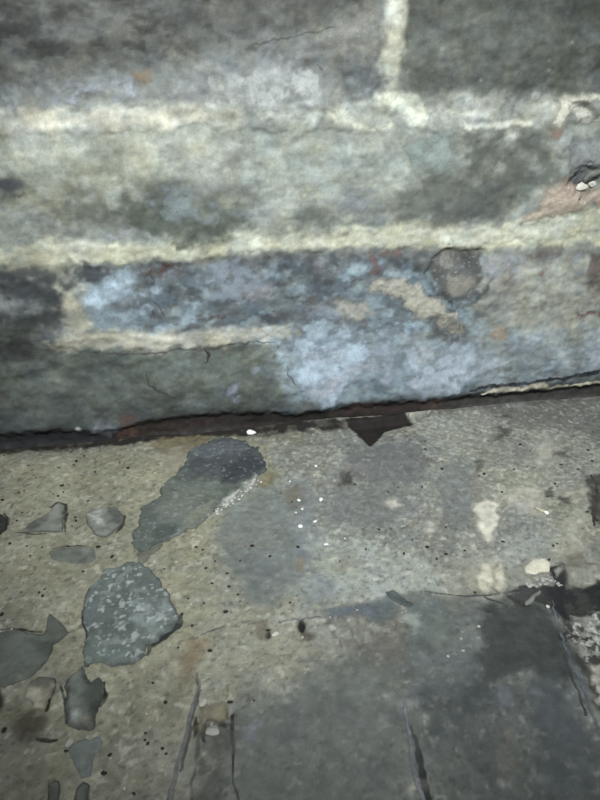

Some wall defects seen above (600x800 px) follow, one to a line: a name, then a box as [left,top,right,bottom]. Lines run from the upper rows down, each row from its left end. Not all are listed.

spalling [523,137,600,222]
water stain [0,262,159,310]
water stain [207,264,273,302]
spalling [428,248,481,313]
crack [0,370,600,454]
water stain [294,300,395,408]
water stain [404,341,498,396]
peeling [0,438,274,800]
water stain [403,596,572,686]
spalling [507,558,600,710]
crack [552,602,600,735]
crack [402,704,431,800]